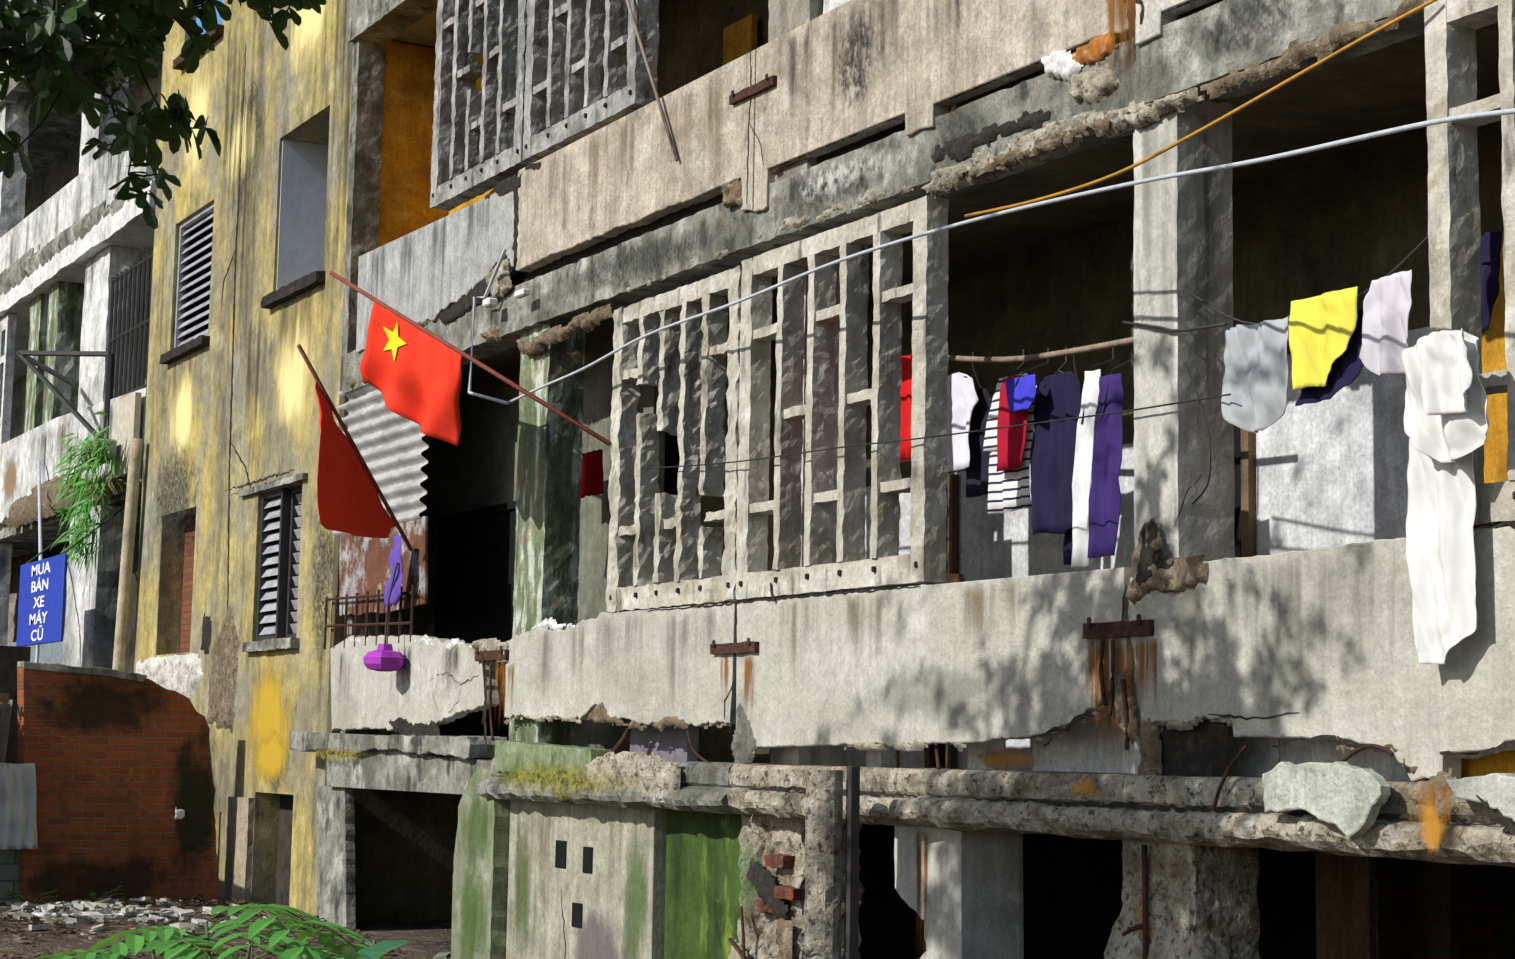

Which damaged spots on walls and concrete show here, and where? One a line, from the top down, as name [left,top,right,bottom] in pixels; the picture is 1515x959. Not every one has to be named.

corrosion [1108,0,1135,52]
spalling [756,0,1424,239]
spalling [626,249,735,292]
spalling [135,606,241,734]
corrosion [724,657,753,694]
spalling [844,739,966,769]
corrosion [1088,640,1156,723]
spalling [1036,639,1247,810]
peeling [1262,742,1456,838]
corrosion [1418,787,1450,848]
spalling [728,853,805,959]
spalling [1122,844,1149,959]